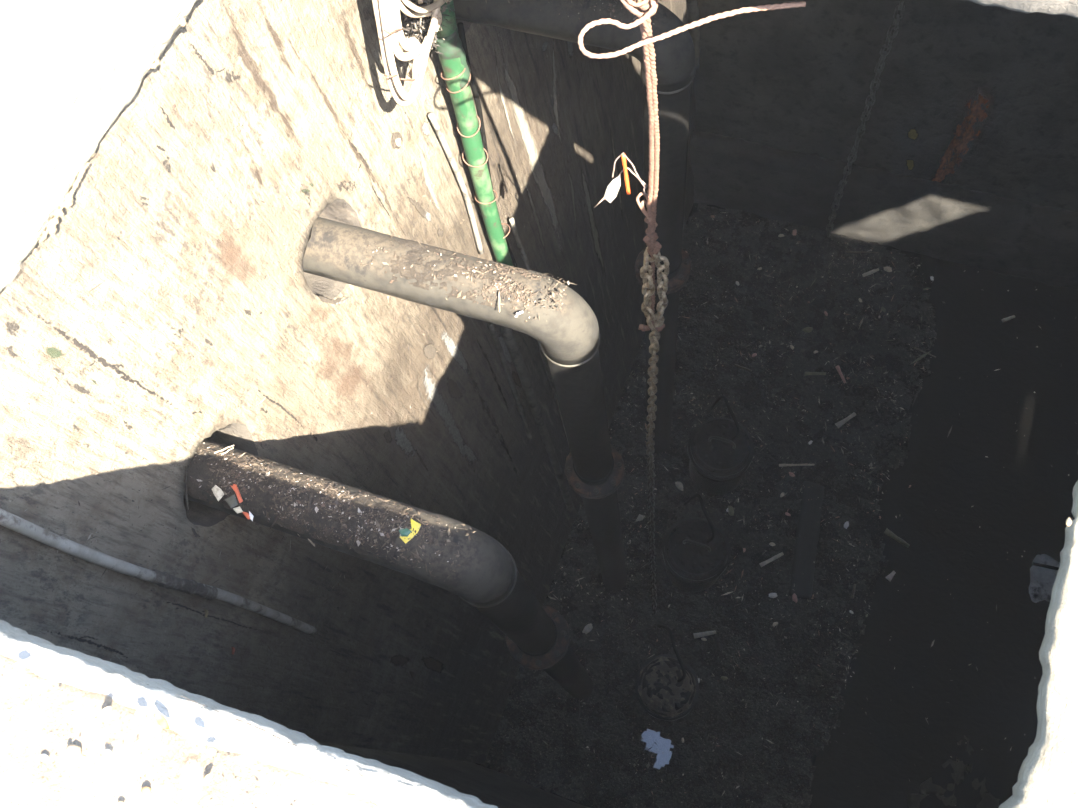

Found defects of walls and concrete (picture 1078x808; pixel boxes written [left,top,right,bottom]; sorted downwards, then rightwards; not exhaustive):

crack [26,307,202,415]